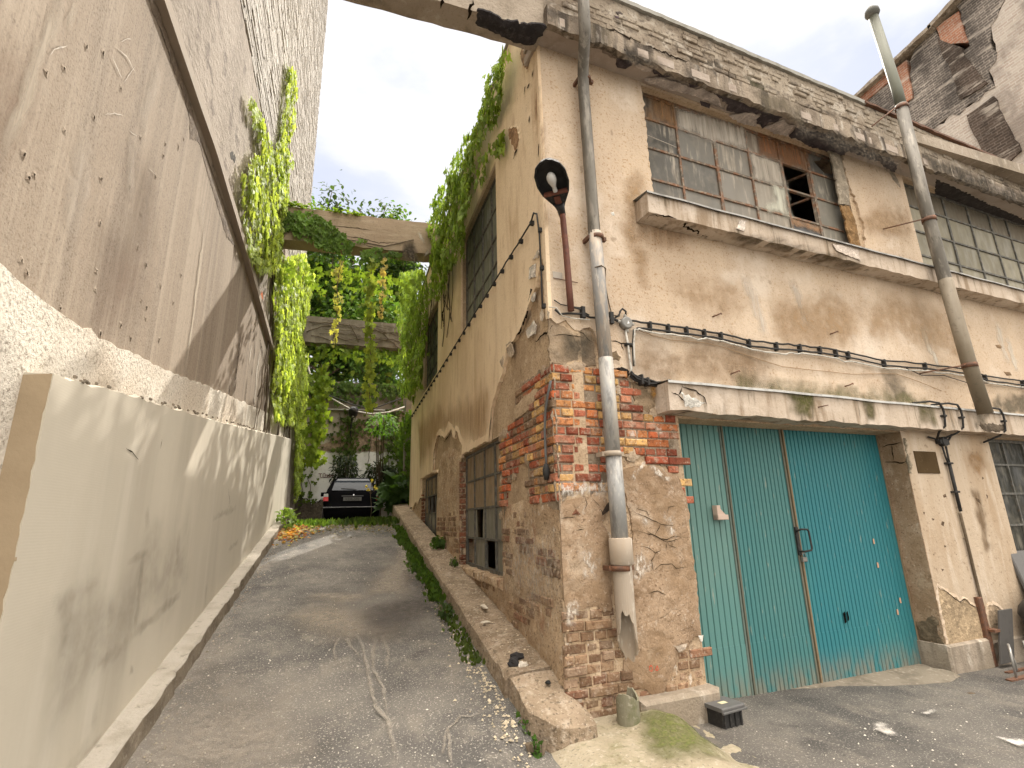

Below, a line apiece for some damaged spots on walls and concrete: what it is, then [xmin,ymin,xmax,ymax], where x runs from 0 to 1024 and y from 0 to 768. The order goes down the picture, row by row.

crack [466,1,474,20]
spalling [475,8,547,73]
peeling [602,48,901,261]
crack [648,215,707,237]
water stain [738,236,856,266]
spalling [612,348,694,503]
crack [672,386,713,414]
water stain [977,395,1024,423]
spalling [413,263,650,719]
crack [559,465,701,695]
spalling [916,583,1003,645]
corrosion [973,596,1000,667]